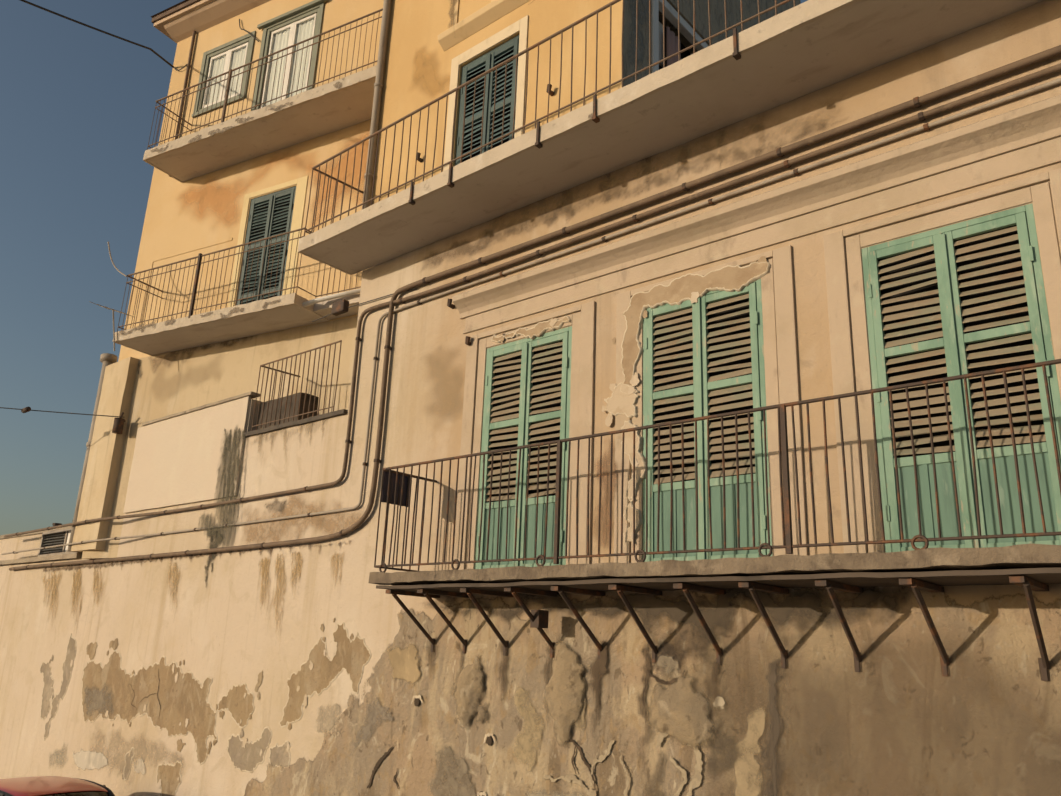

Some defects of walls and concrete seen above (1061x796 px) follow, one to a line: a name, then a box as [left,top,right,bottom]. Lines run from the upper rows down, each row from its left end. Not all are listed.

water stain [313,137,369,202]
flaking render [491,316,571,343]
flaking render [602,256,771,544]
flaking render [40,587,1061,796]
crack [564,739,596,790]
water stain [442,587,1061,796]